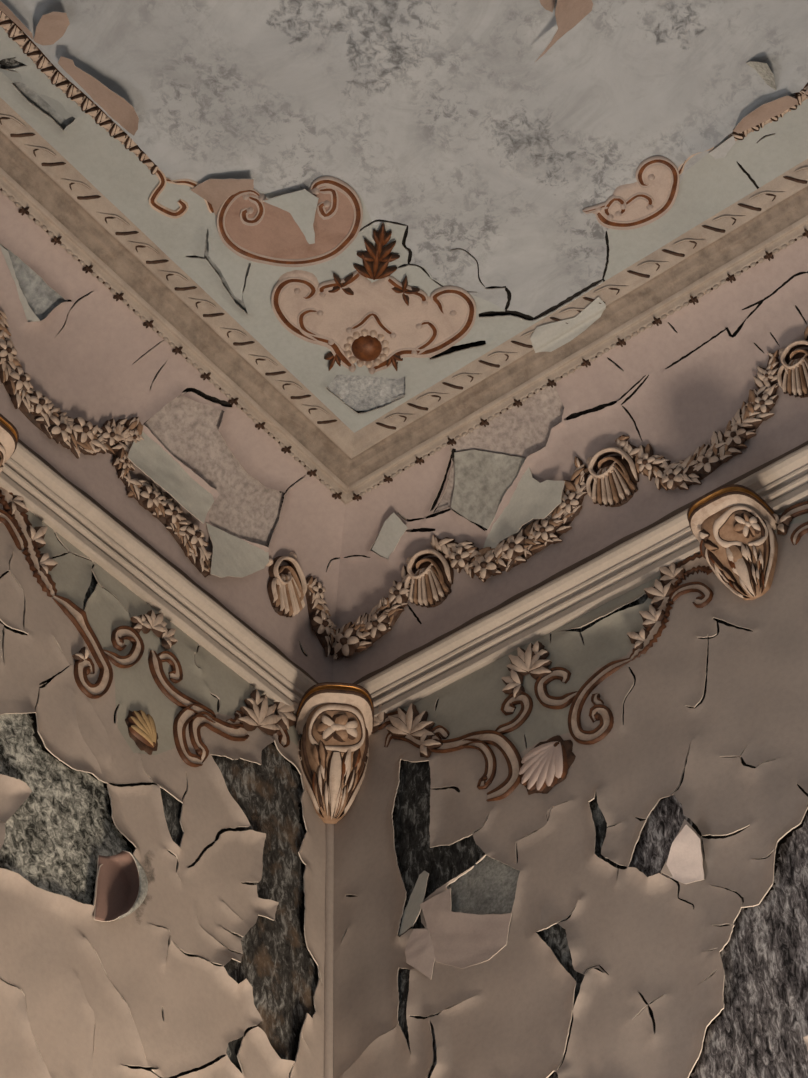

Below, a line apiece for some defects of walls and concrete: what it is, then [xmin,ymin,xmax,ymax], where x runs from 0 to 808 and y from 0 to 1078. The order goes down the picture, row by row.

crack [451,231,609,320]
crack [566,271,808,442]
peeling [127,381,294,578]
crack [407,449,488,532]
peeling [364,377,578,568]
crack [540,575,661,650]
peeling [0,698,148,927]
crack [123,1057,220,1078]
peeling [203,732,325,1078]
crack [387,956,449,1072]
peeling [384,750,530,979]
peeling [672,803,808,1078]